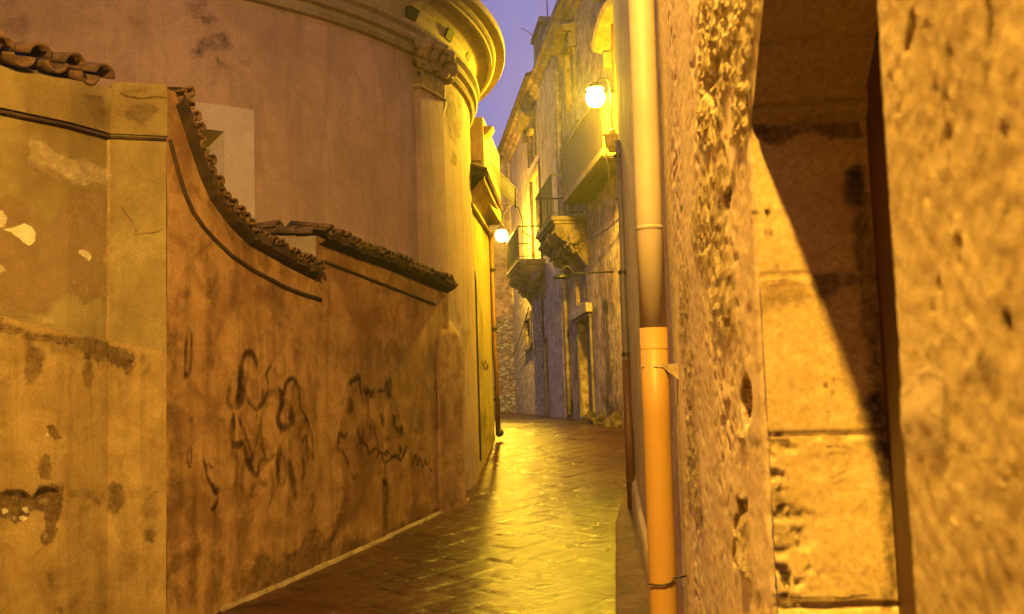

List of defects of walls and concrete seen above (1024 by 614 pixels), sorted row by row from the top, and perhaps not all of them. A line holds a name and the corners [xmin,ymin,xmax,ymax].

flaking render [0,141,108,323]
flaking render [0,484,63,544]